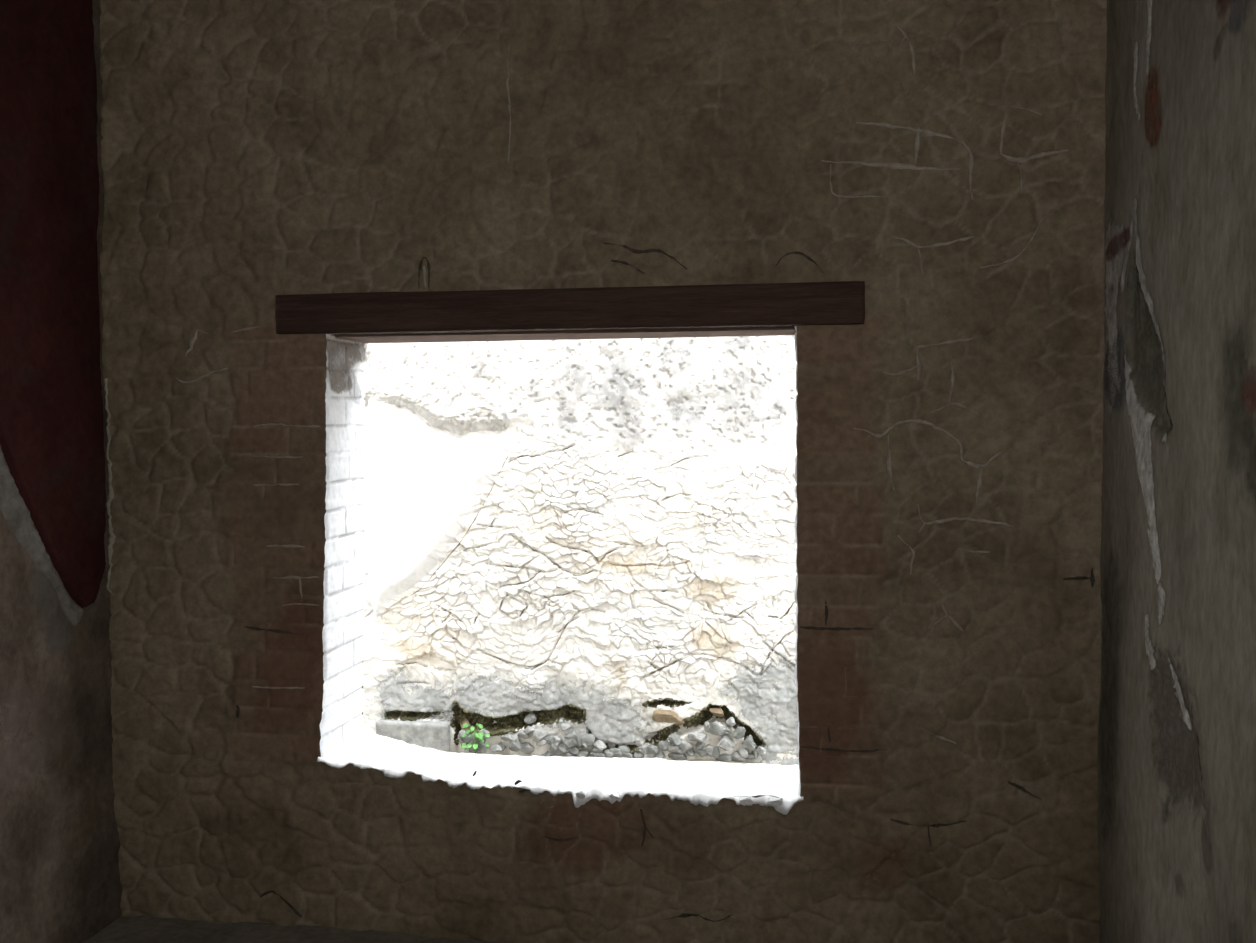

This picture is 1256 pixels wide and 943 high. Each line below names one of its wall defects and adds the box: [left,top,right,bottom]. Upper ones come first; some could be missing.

crack [410,445,874,678]